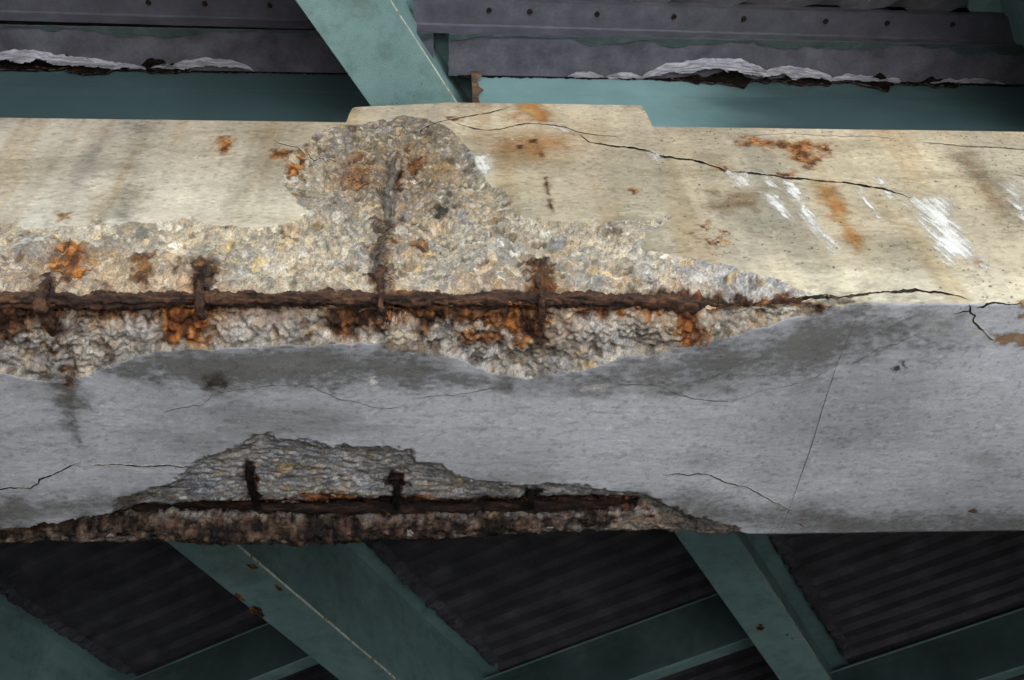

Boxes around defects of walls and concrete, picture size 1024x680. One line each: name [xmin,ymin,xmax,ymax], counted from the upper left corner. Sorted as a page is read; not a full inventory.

crack [413,108,911,198]
crack [926,142,1024,176]
spalling [0,115,855,382]
leakage [710,170,834,247]
leakage [911,196,986,268]
rust [0,256,221,387]
rust [286,256,660,349]
rust [656,288,827,347]
crack [770,288,1020,341]
crack [0,463,199,490]
rust [0,490,657,547]
spalling [0,432,746,543]